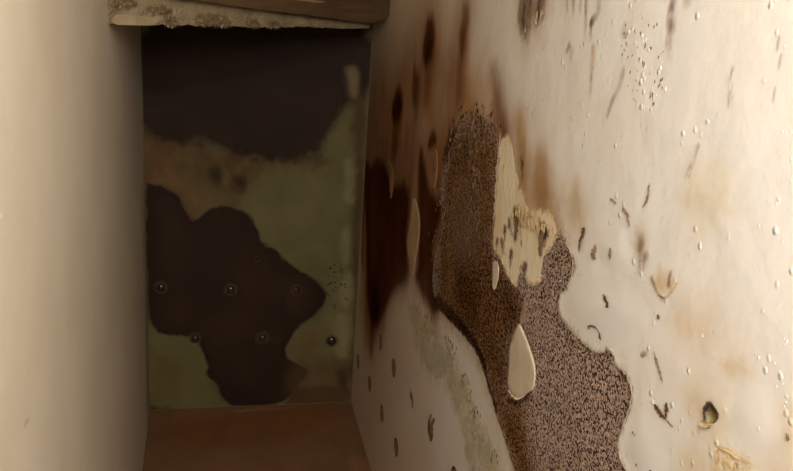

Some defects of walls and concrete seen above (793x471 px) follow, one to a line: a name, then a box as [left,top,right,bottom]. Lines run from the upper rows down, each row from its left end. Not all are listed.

spalling [111,0,178,29]
spalling [195,14,232,29]
water stain [424,21,434,62]
water stain [141,24,408,406]
water stain [416,154,440,309]
peeling [407,103,632,471]
spalling [700,401,719,428]